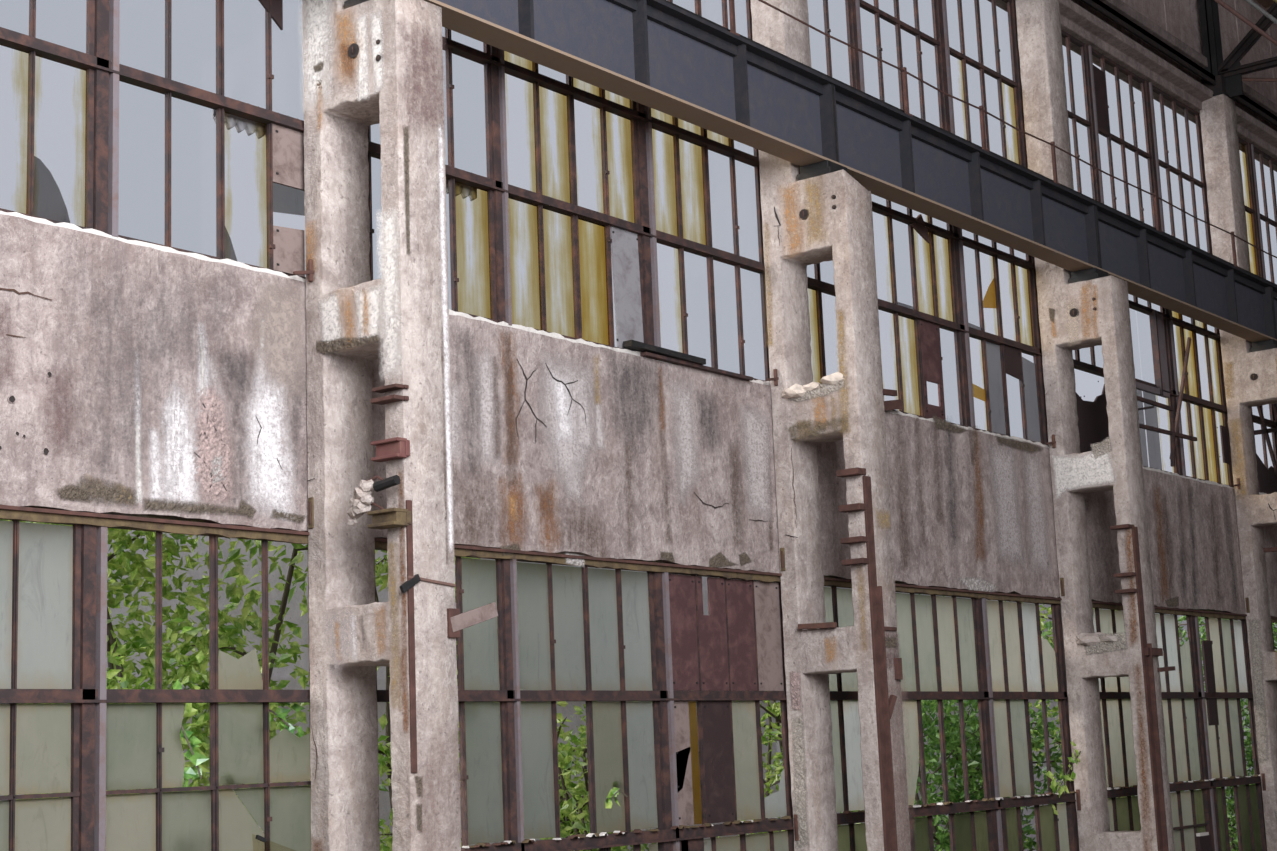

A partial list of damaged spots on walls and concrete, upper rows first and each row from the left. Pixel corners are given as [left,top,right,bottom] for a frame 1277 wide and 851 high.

corrosion [337,16,355,78]
corrosion [784,182,823,251]
damp [96,294,300,513]
spalling [316,335,379,354]
spalling [788,379,845,401]
spalling [789,418,846,441]
corrosion [814,312,848,433]